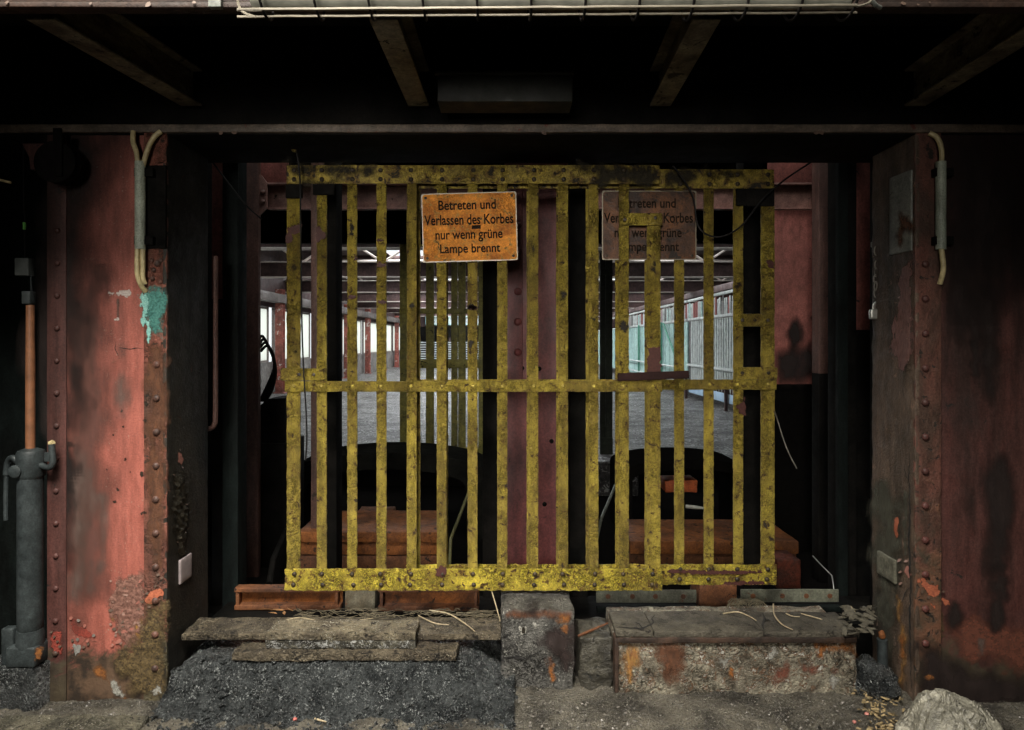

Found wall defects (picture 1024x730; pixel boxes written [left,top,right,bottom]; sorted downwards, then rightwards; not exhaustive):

water stain [983,456,1014,632]
corrosion [94,601,169,696]
peeling [108,572,164,649]
corrosion [656,643,684,683]
peeling [897,559,950,609]
corrosion [941,613,1024,672]